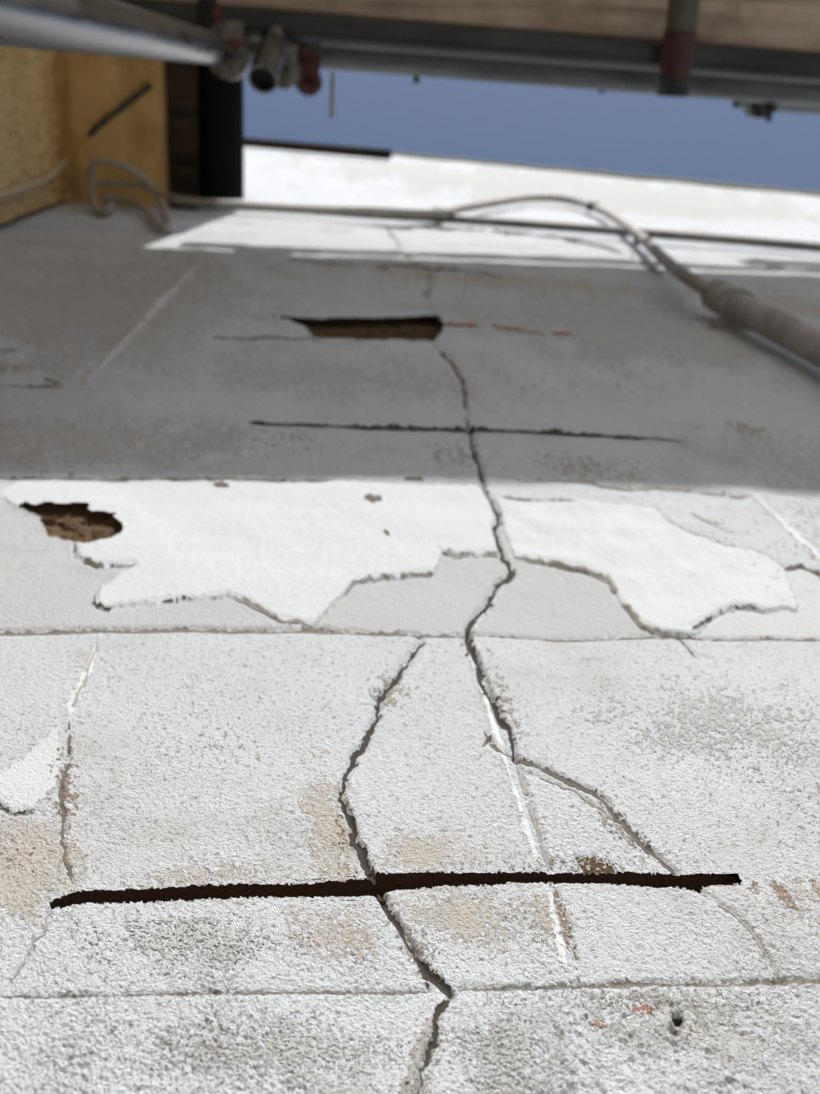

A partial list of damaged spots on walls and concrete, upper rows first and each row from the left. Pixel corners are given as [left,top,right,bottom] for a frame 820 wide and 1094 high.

spalling [273,313,444,346]
crack [288,223,662,336]
crack [516,476,748,499]
peeling [0,503,661,641]
crack [440,352,678,875]
peeling [657,509,820,657]
crack [58,636,100,884]
corrosion [104,735,498,890]
crack [337,642,452,1094]
corrosion [266,886,581,978]
crack [701,892,781,985]
crack [554,1023,565,1073]